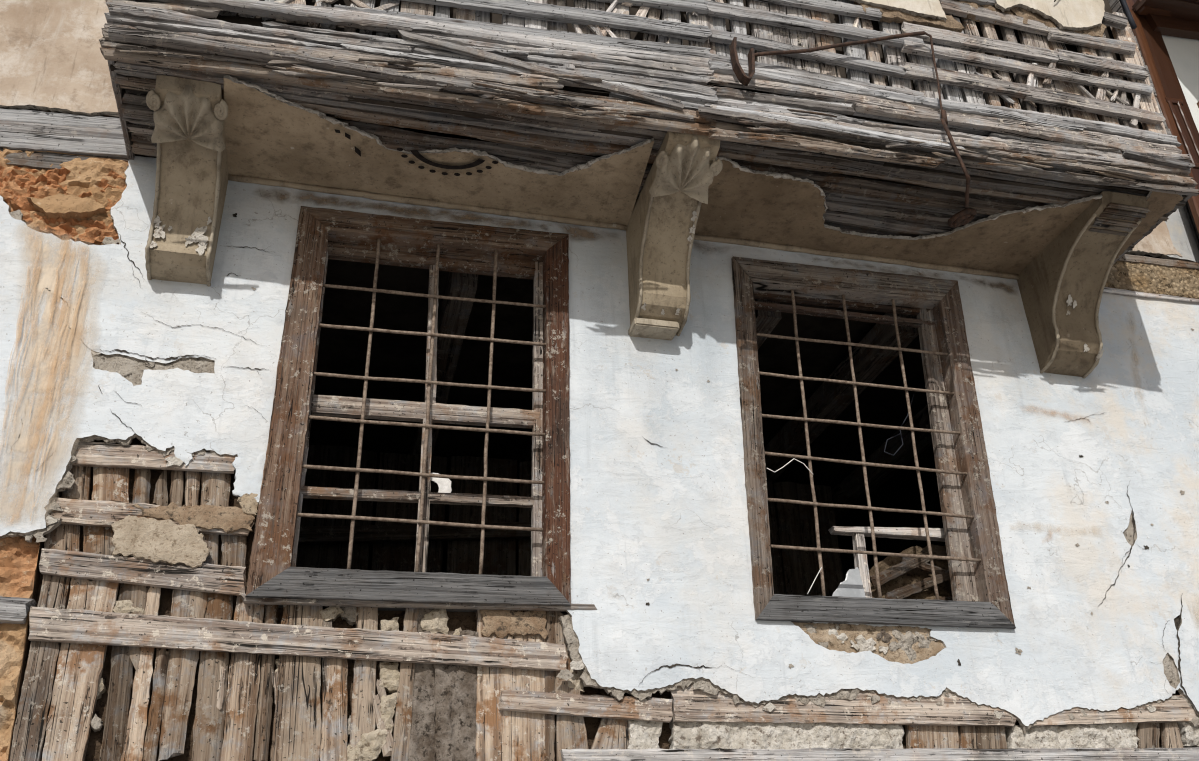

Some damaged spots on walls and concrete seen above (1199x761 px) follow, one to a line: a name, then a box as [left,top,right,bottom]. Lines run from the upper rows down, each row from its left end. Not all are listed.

spalling [0,166,127,245]
water stain [0,230,95,519]
spalling [91,351,215,386]
flaking render [0,434,218,542]
crack [1100,486,1146,604]
spalling [1123,515,1149,549]
crack [638,663,754,687]
flaking render [556,614,955,712]
flaking render [971,702,1044,735]
spalling [1125,654,1199,727]
crack [1162,598,1199,714]